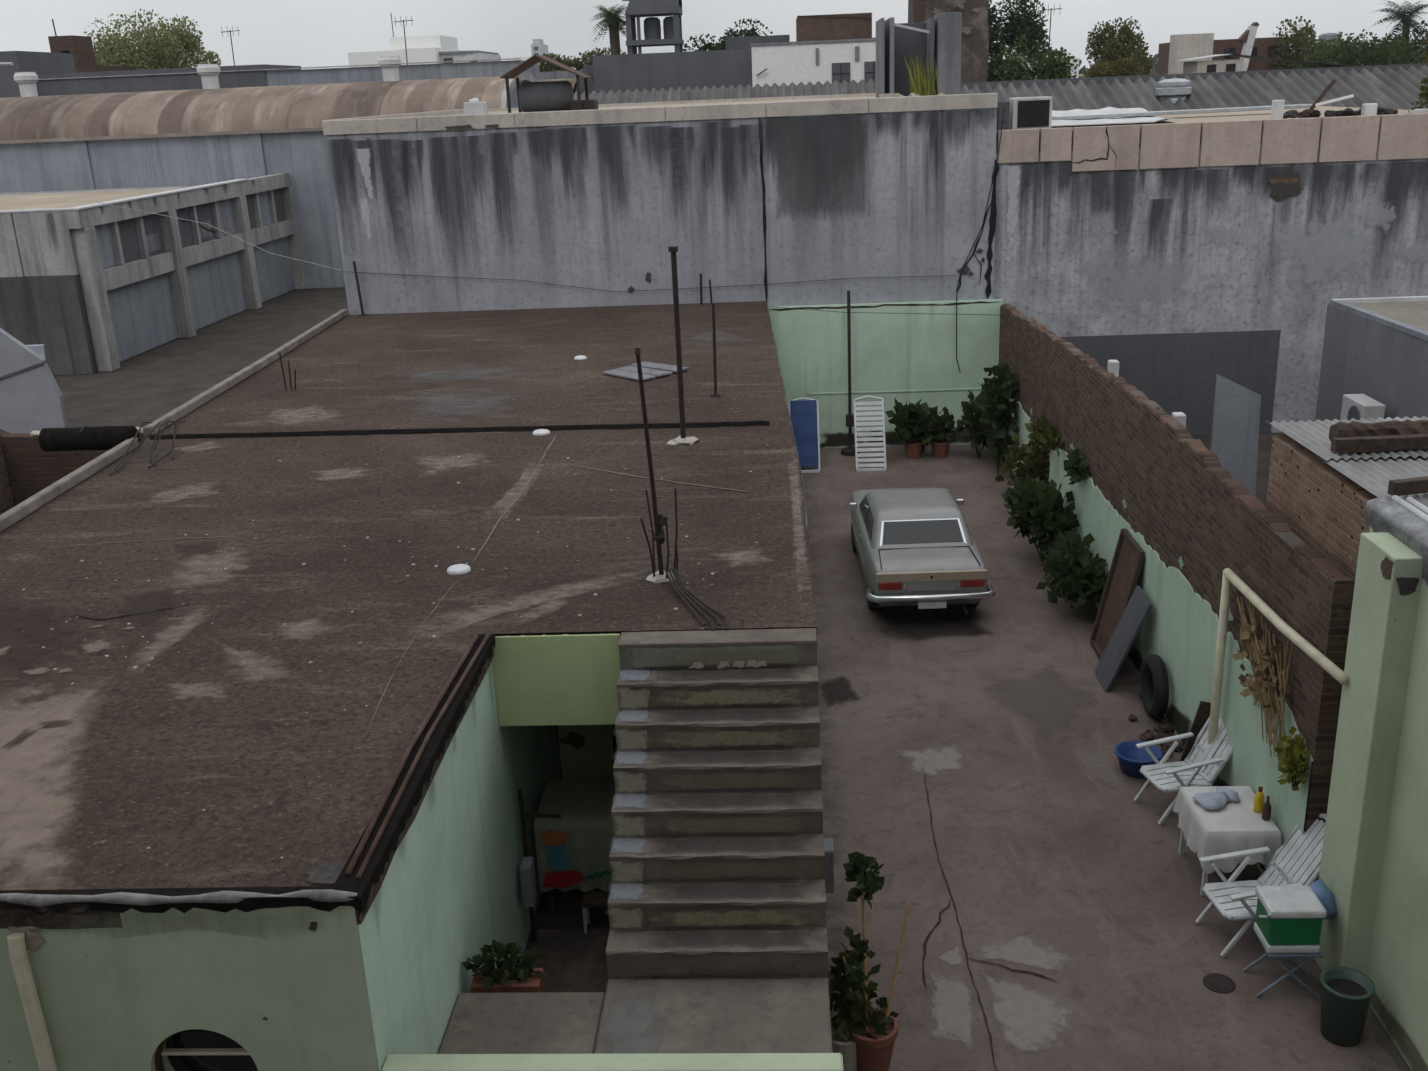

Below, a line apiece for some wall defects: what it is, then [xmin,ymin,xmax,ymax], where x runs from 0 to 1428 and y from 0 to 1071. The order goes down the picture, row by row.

water stain [332,109,994,249]
water stain [1003,161,1145,262]
spalling [1268,171,1302,202]
water stain [1150,161,1428,231]
spalling [1380,556,1419,595]
crack [922,773,1057,1071]